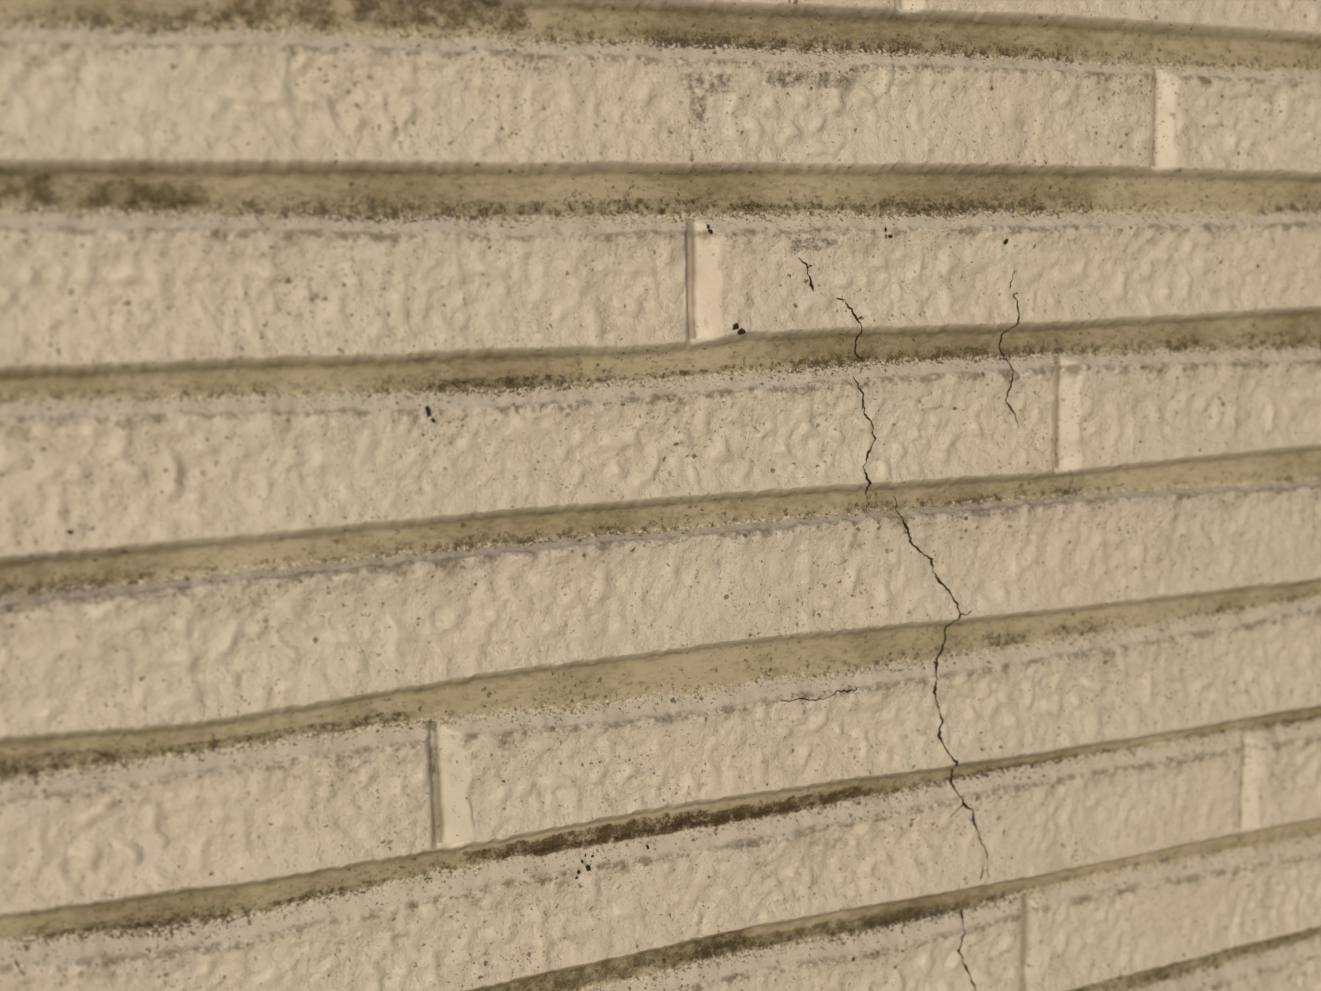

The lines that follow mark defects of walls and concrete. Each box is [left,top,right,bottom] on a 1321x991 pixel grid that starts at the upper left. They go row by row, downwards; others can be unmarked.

crack [999,270,1020,427]
crack [798,257,989,880]
crack [778,687,860,702]
crack [957,907,976,991]